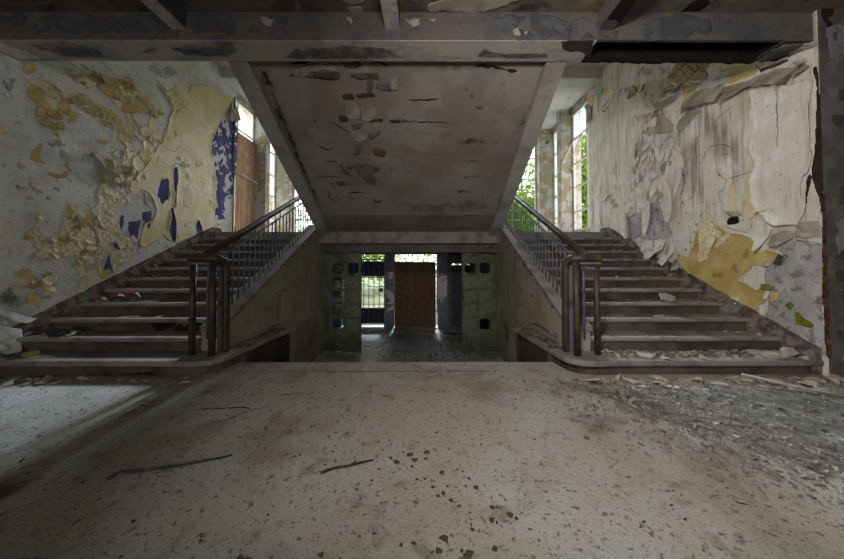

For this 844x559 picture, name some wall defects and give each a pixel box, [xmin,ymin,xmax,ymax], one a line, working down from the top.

peeling [821,8,844,59]
peeling [0,27,238,293]
peeling [291,61,405,186]
peeling [427,0,826,355]
crack [681,107,752,202]
peeling [15,269,58,306]
corrosion [819,194,832,359]
peeling [835,218,844,260]
crack [170,405,264,422]